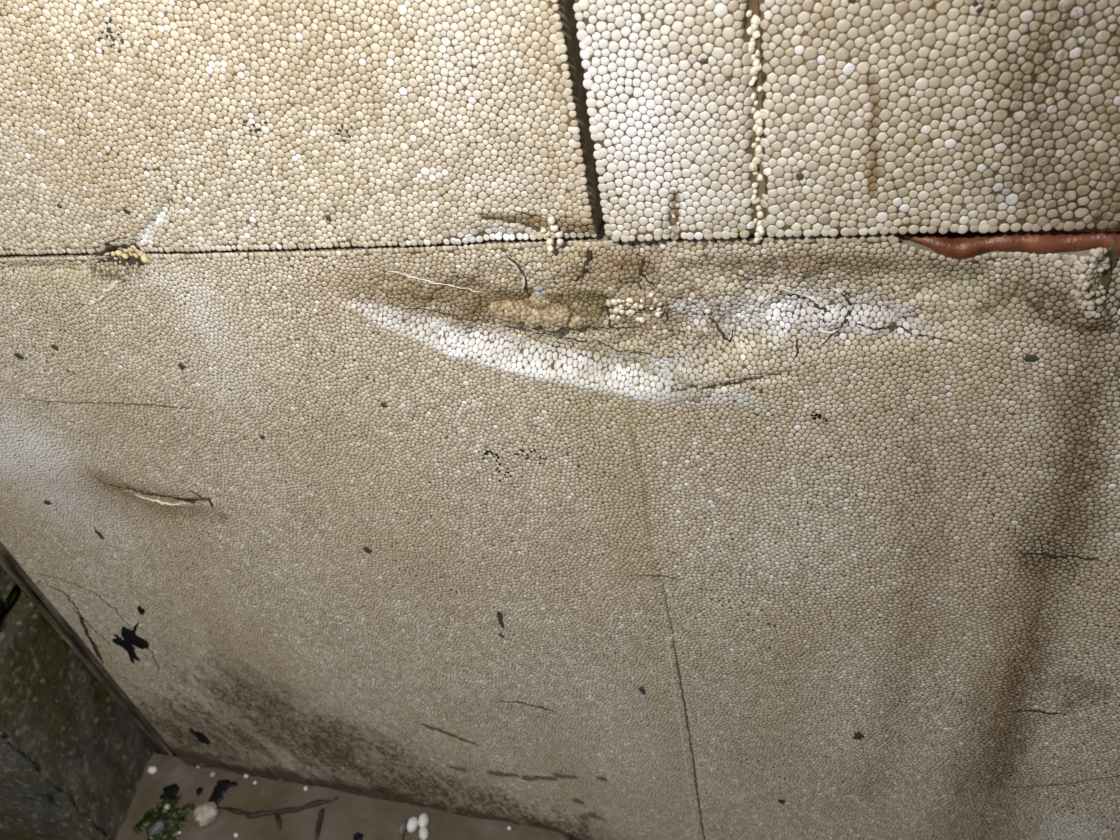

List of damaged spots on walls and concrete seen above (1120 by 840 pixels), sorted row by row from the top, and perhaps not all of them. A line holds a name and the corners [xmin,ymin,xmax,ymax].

damp [1021,4,1074,140]
crack [357,246,964,392]
damp [1031,212,1120,331]
crack [98,480,221,516]